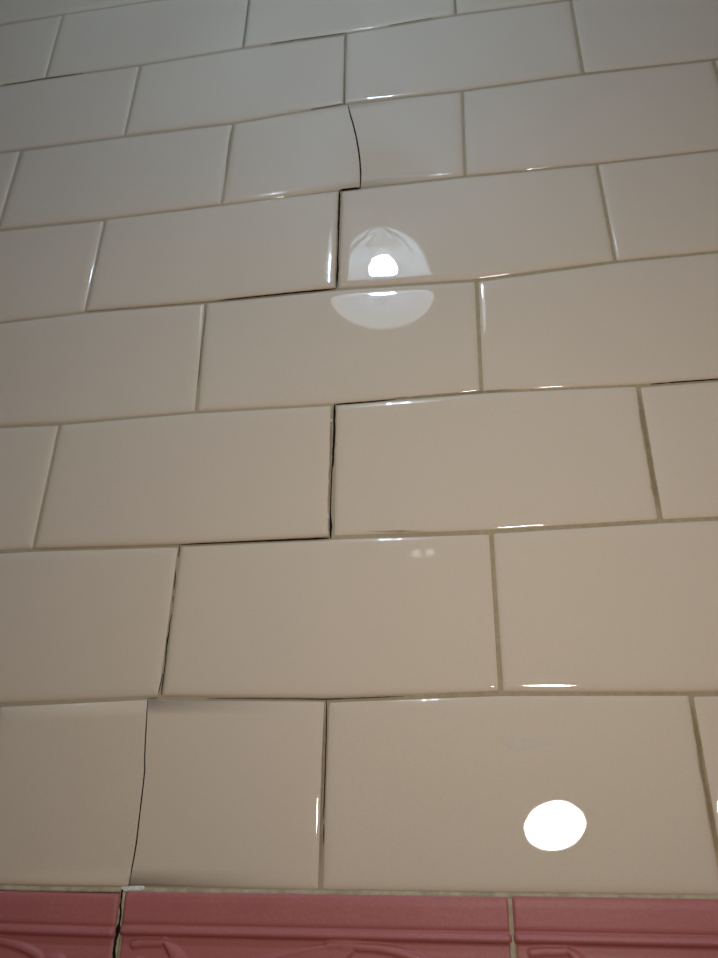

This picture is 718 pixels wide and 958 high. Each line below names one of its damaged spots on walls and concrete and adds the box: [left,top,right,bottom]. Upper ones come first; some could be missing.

crack [197,33,361,386]
crack [113,399,404,958]